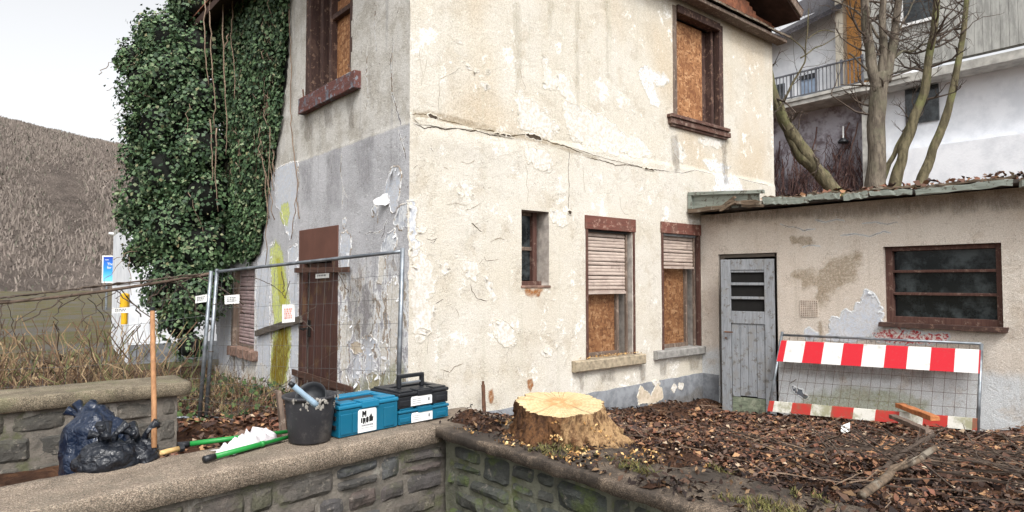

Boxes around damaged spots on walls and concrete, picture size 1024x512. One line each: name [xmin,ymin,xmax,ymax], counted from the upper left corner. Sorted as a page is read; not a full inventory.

crack [365,41,712,216]
peeling [637,64,671,109]
damp [268,243,291,386]
peeling [339,165,498,394]
crack [435,202,505,317]
peeling [804,288,951,346]
flaking render [637,379,684,406]